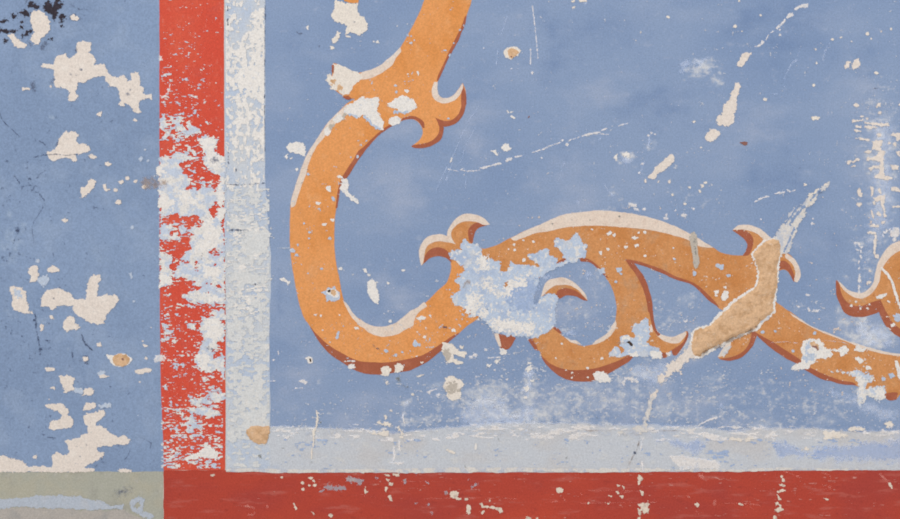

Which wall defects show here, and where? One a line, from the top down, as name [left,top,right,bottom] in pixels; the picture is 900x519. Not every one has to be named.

peeling [330,0,368,50]
peeling [41,40,152,122]
peeling [324,63,419,136]
peeling [10,259,119,332]
peeling [699,259,747,301]
peeling [0,367,130,474]
peeling [445,483,510,515]